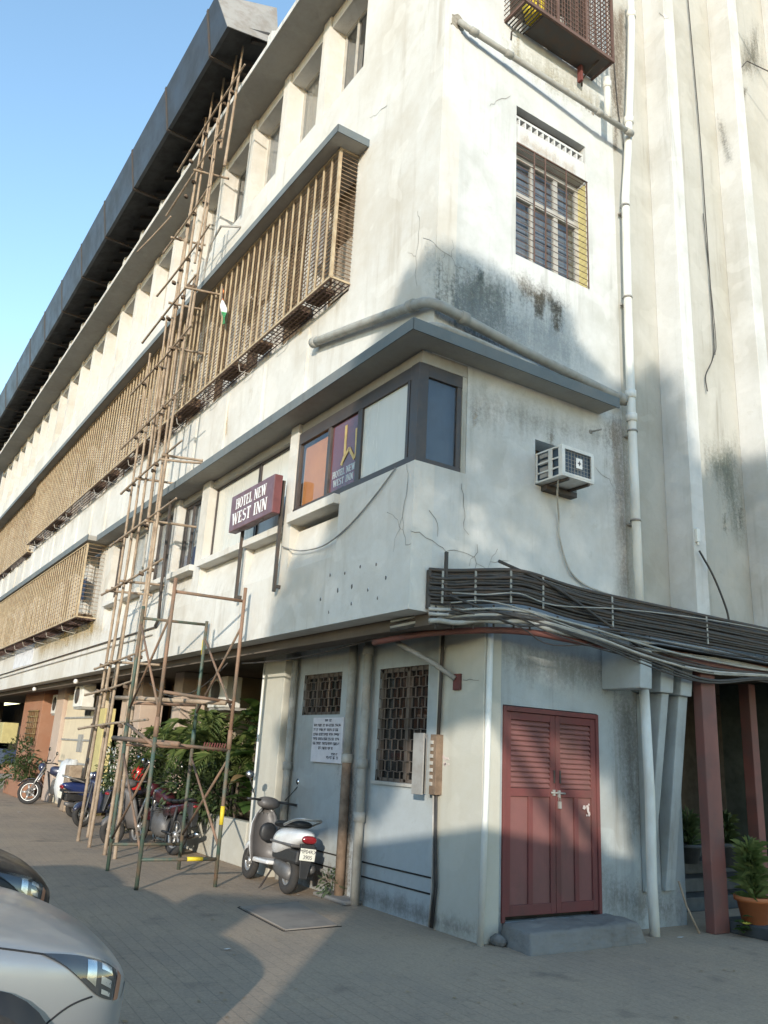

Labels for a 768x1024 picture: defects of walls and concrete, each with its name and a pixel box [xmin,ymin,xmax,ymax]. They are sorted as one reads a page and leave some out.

crack [411,211,468,284]
water stain [452,273,502,329]
water stain [522,283,561,329]
crack [387,471,505,568]